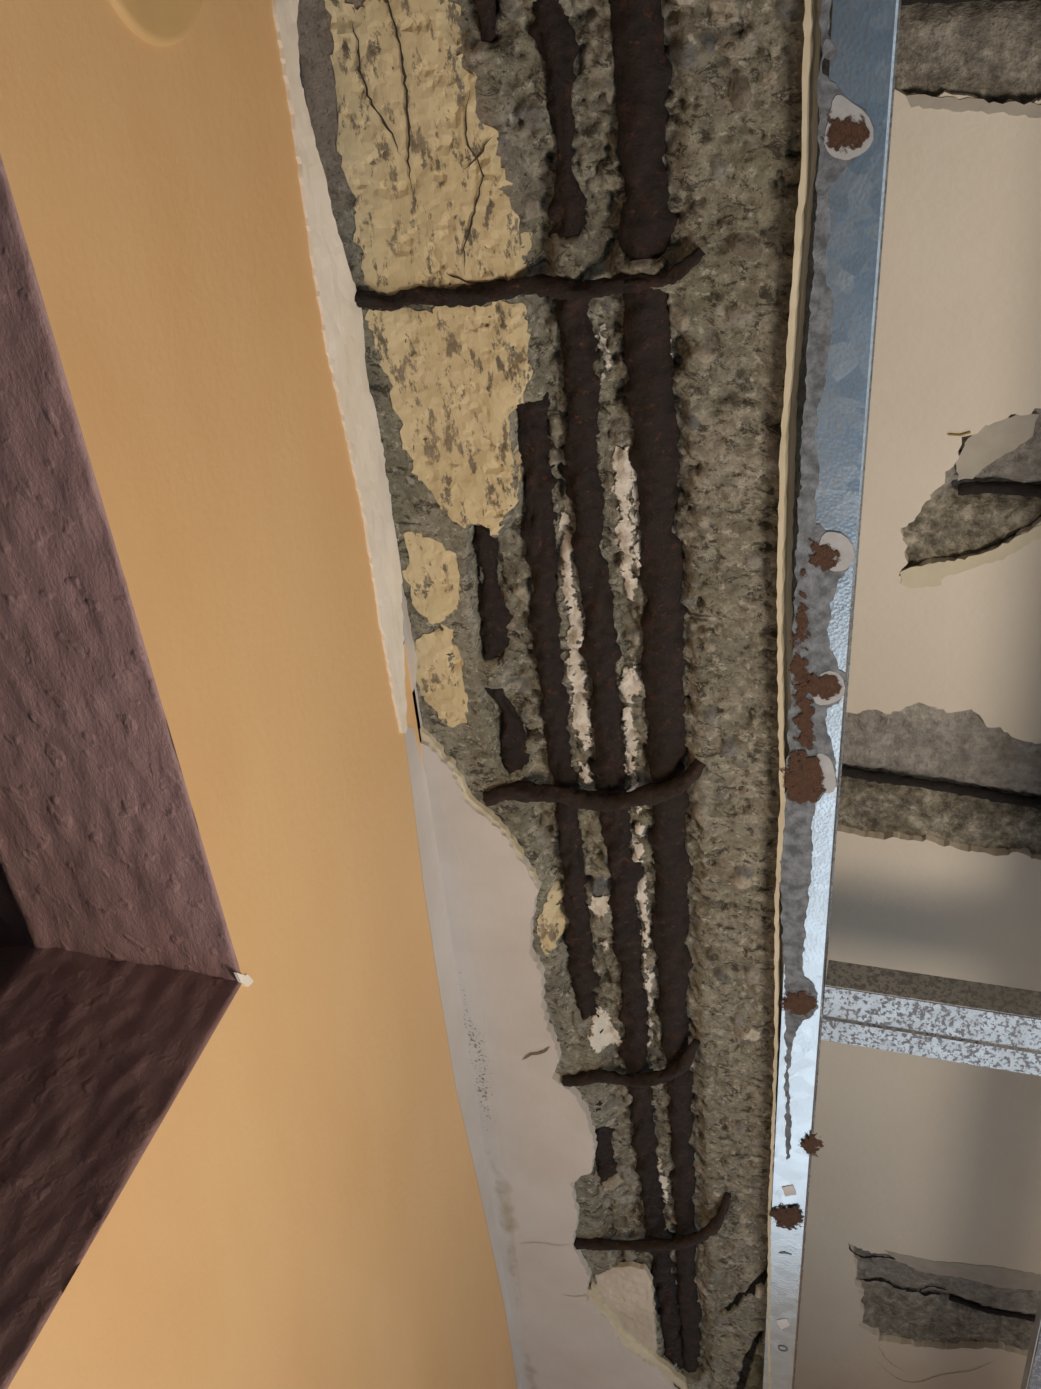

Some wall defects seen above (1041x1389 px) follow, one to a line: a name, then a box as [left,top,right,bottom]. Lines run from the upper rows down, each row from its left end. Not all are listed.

crack [351,0,413,191]
crack [447,90,491,284]
rust [822,111,870,154]
spalling [895,0,1041,118]
spalling [900,408,1041,589]
spalling [297,0,805,1389]
rust [780,539,843,804]
spalling [838,702,1041,855]
rust [780,990,818,1018]
rust [769,1206,804,1230]
rust [798,1133,824,1157]
spalling [854,1246,1041,1351]